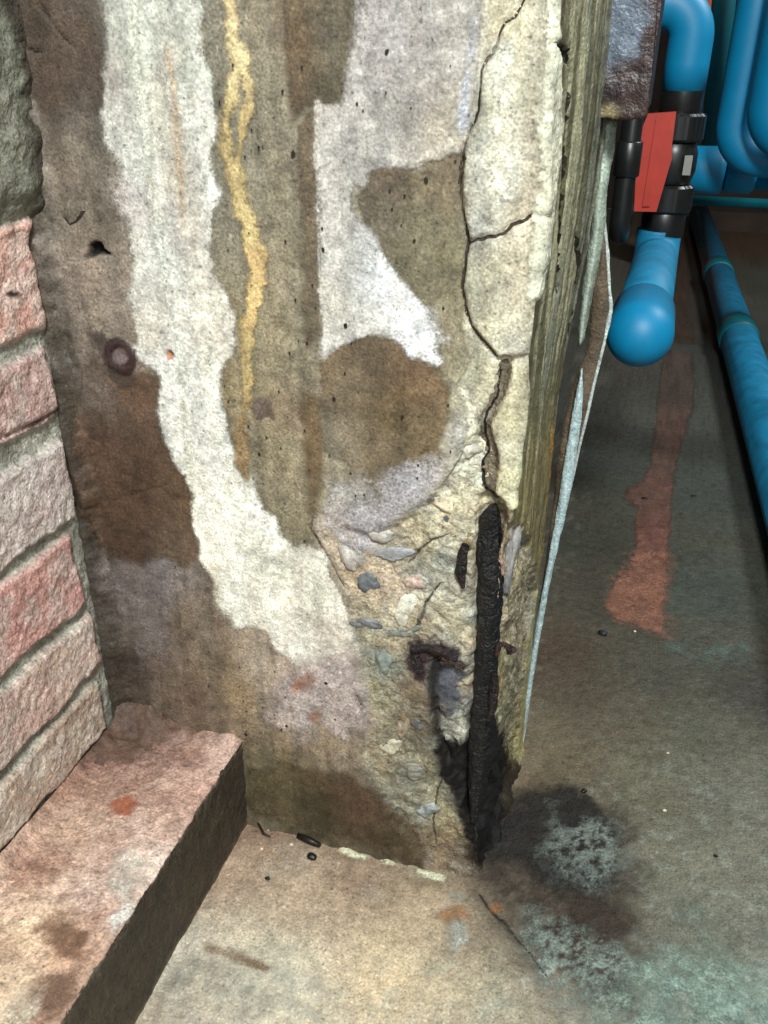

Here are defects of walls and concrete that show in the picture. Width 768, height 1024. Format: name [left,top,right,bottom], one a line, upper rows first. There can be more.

crack [411,0,532,498]
rust [90,332,136,387]
water stain [20,0,368,740]
water stain [304,153,485,562]
water stain [79,702,198,767]
water stain [248,761,446,882]
spalling [309,368,583,877]
rust [455,543,469,589]
rust [433,674,521,870]
rust [494,641,517,657]
water stain [477,786,640,1011]